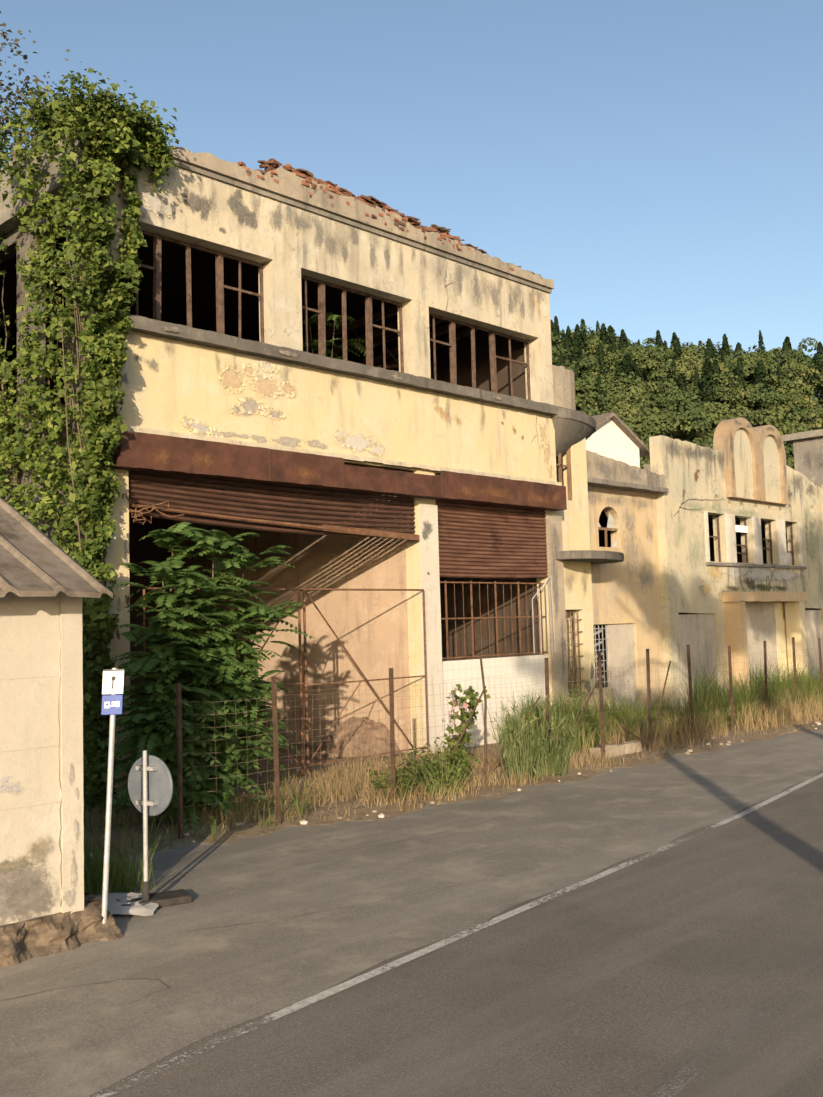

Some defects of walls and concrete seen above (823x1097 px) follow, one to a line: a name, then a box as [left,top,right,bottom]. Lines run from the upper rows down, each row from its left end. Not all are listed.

leakage [172,189,212,220]
leakage [228,189,257,228]
flaking render [237,159,469,252]
peeling [217,350,298,398]
leakage [668,435,734,474]
leakage [727,566,806,591]